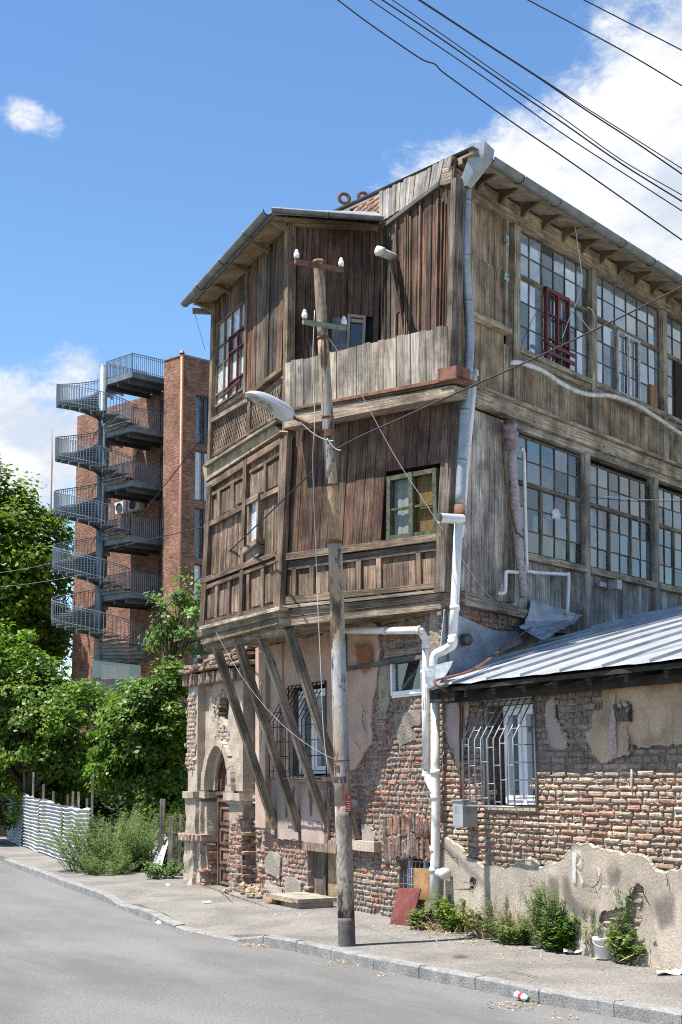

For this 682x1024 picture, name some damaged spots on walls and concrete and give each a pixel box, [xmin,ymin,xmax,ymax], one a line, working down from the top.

spalling [184,694,197,770]
spalling [212,689,230,741]
flaking render [444,702,470,771]
flaking render [543,694,569,750]
flaking render [586,674,682,764]
spalling [198,782,265,892]
flaking render [432,837,682,971]